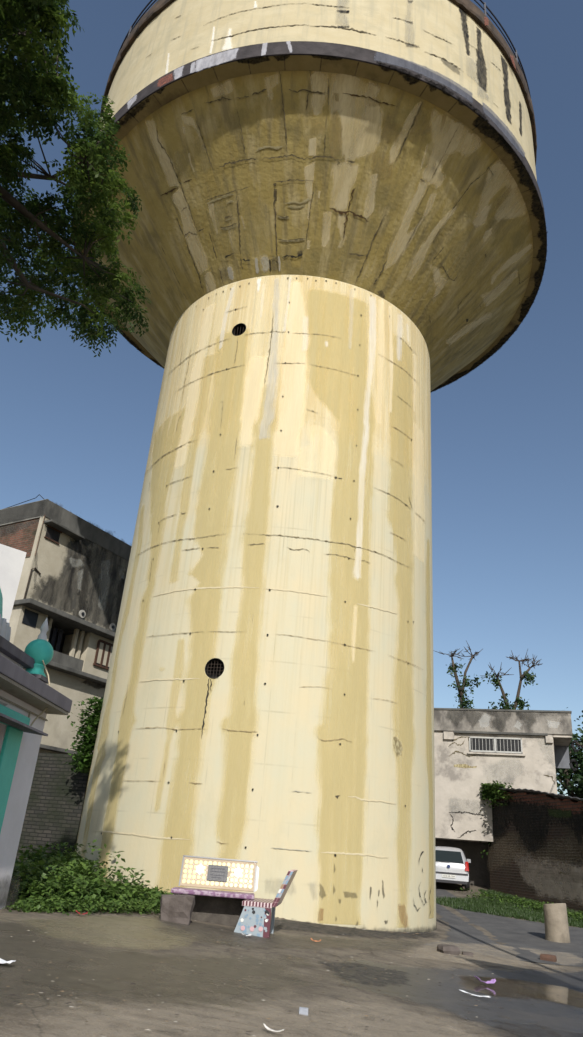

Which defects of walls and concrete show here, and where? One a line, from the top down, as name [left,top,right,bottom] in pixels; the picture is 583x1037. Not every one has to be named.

damp [459,8,488,98]
crack [156,72,423,297]
crack [407,122,497,327]
damp [33,54,547,933]
crack [123,677,256,737]
damp [487,796,583,864]